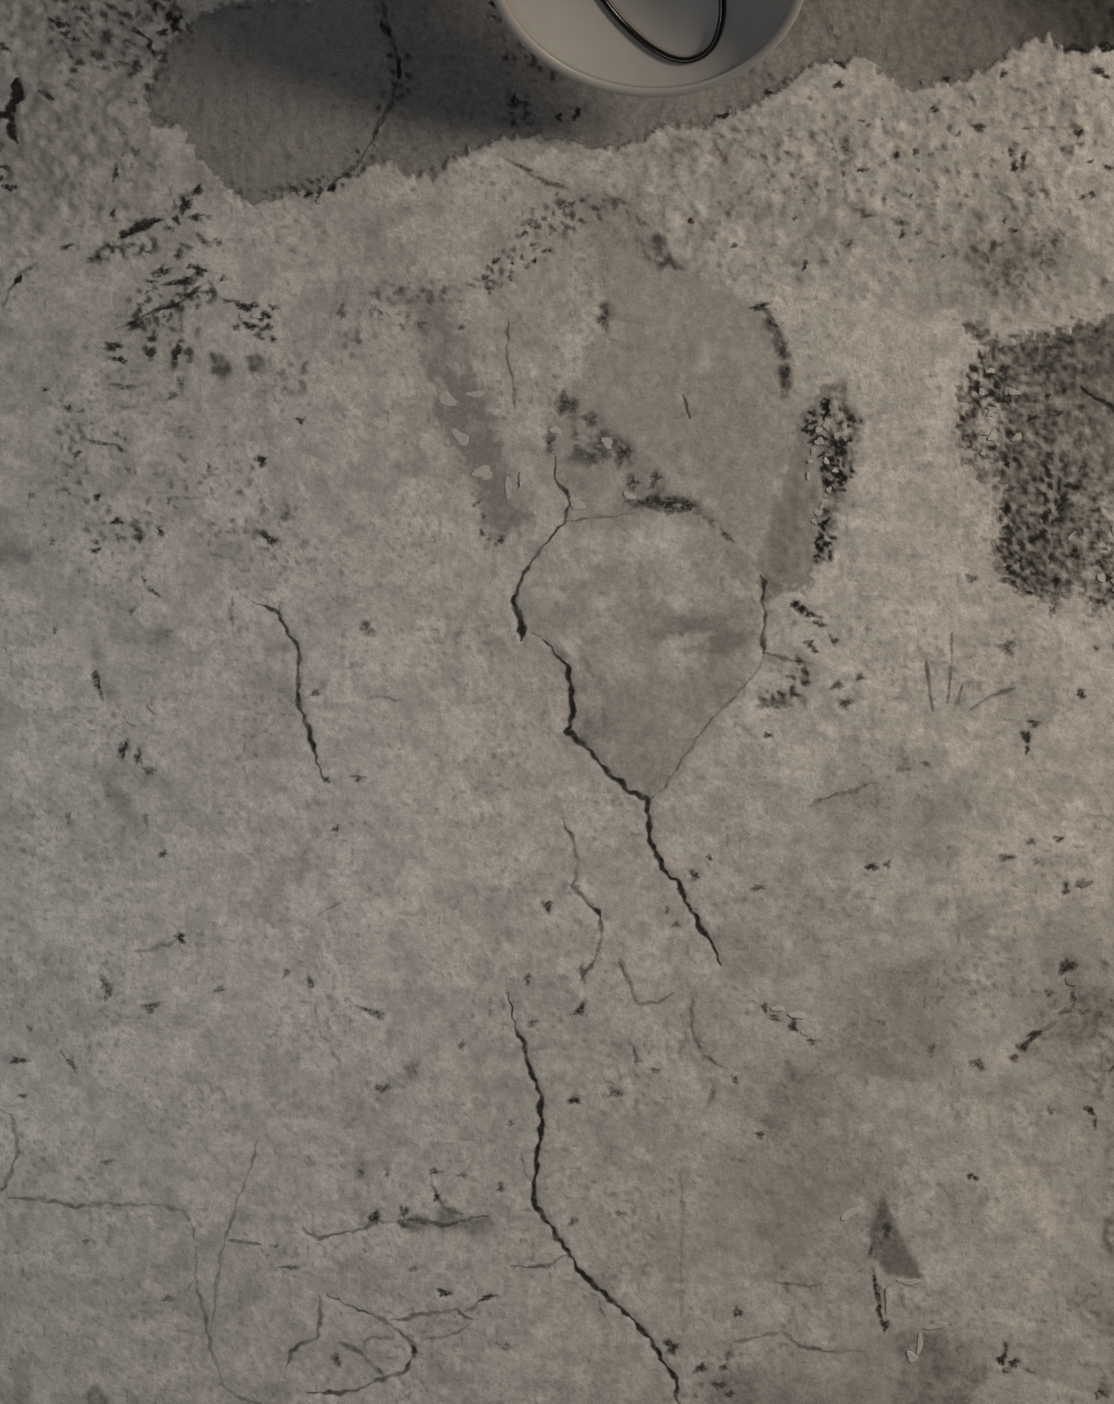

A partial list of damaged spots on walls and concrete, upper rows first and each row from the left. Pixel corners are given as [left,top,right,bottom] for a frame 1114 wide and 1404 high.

spalling [49,0,1114,365]
peeling [418,311,534,542]
crack [251,599,330,783]
crack [511,457,722,966]
crack [507,993,680,1404]